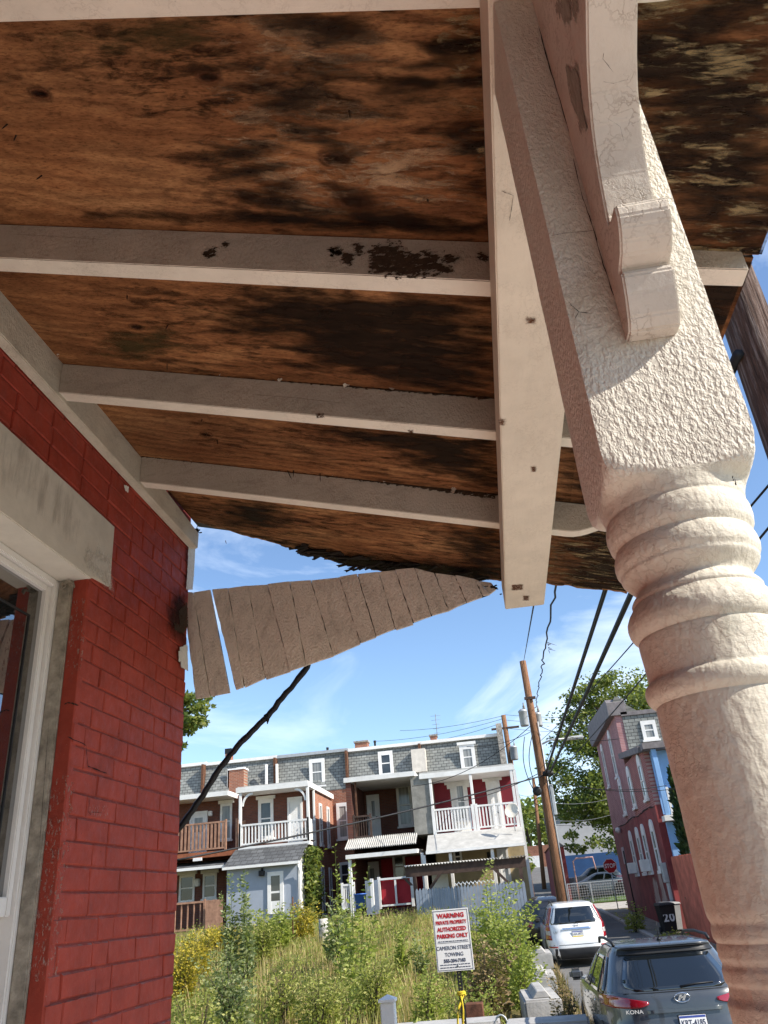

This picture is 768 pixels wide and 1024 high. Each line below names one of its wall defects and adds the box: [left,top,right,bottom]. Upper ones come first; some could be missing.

leakage [177,16,488,233]
leakage [637,0,768,331]
peeling [201,242,230,258]
peeling [327,239,459,280]
leakage [103,287,494,393]
leakage [279,425,498,495]
leakage [555,447,585,505]
leakage [179,496,501,576]
leakage [555,531,626,591]